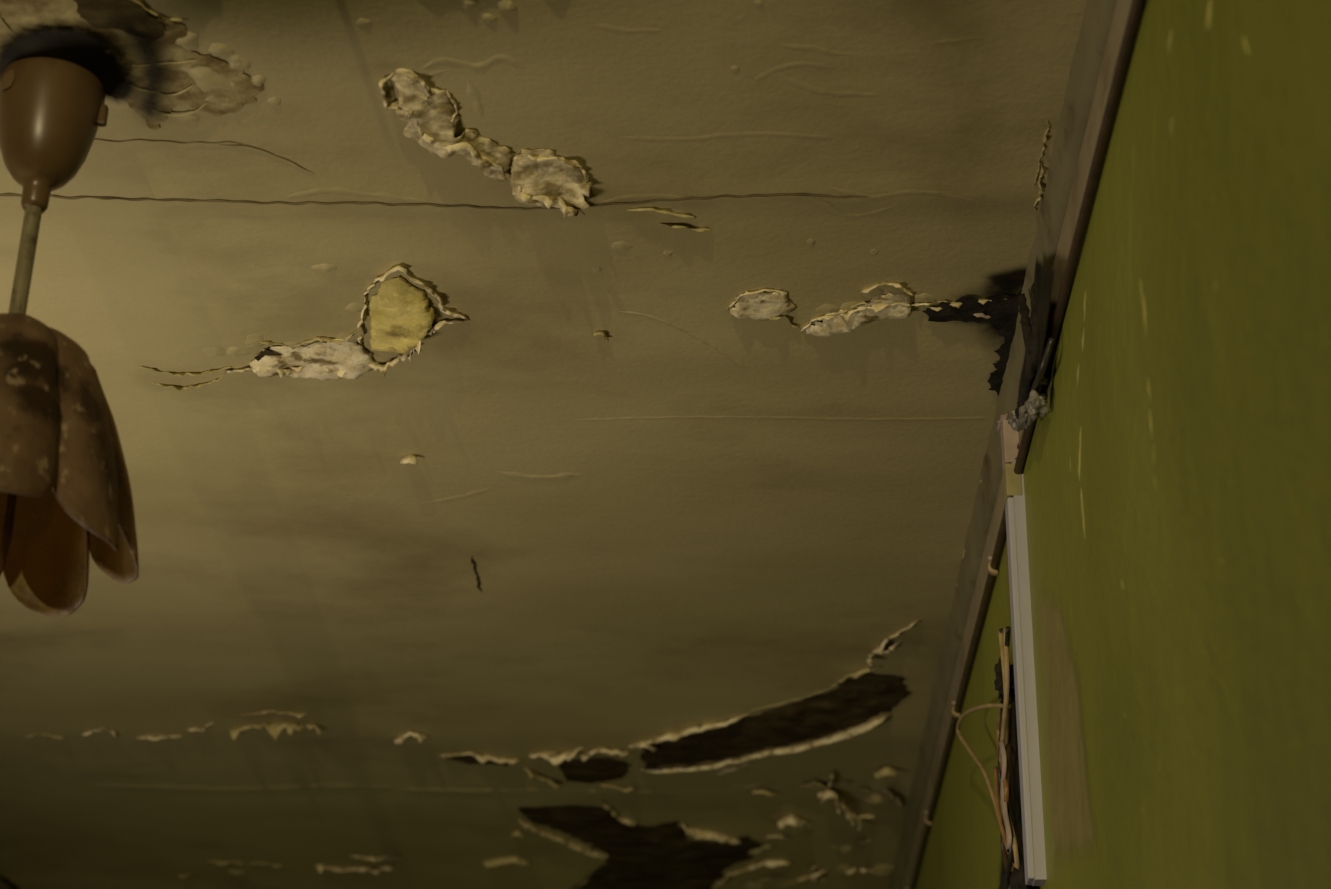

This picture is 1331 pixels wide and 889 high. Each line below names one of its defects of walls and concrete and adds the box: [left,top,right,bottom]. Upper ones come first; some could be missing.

peeling [379,68,592,217]
peeling [627,208,712,232]
peeling [140,264,470,390]
peeling [727,282,947,337]
peeling [23,723,213,741]
peeling [230,710,325,741]
peeling [394,730,428,744]
spalling [440,617,924,889]